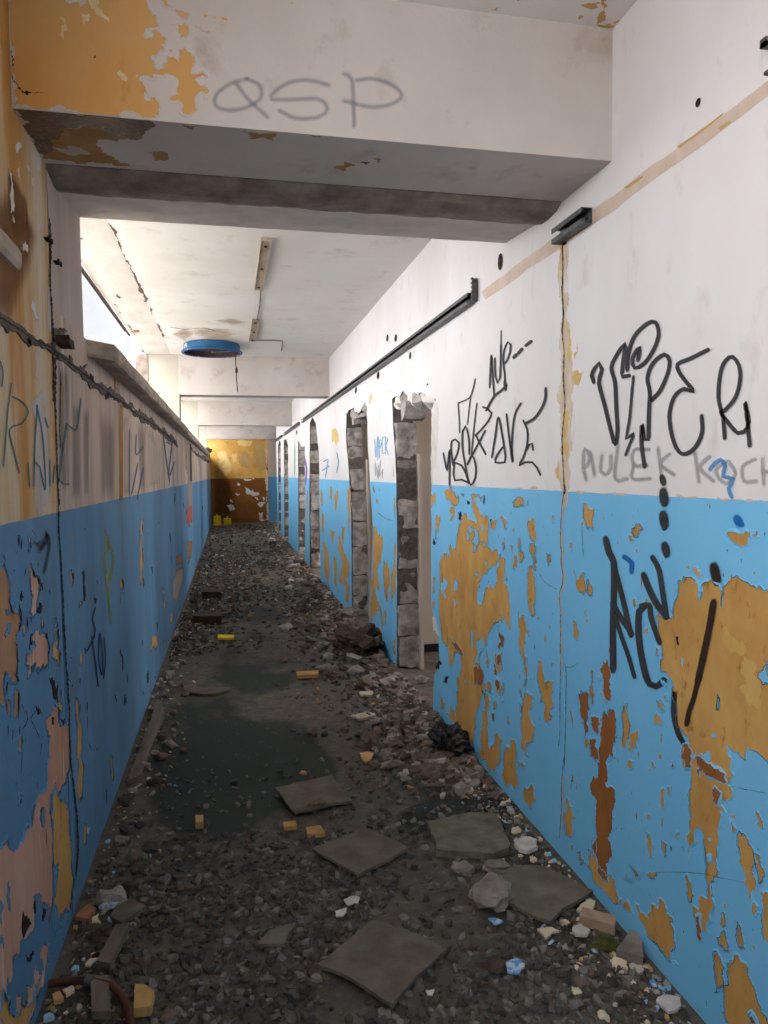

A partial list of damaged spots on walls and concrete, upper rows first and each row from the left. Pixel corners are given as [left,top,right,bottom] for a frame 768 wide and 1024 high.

peeling [9,0,228,223]
peeling [243,131,277,141]
peeling [2,563,60,718]
peeling [217,383,554,810]
crack [540,243,584,838]
peeling [576,490,626,531]
peeling [628,522,643,552]
peeling [726,528,761,548]
peeling [46,696,90,858]
peeling [563,565,768,1024]
peeling [21,887,65,942]
peeling [0,977,45,1024]